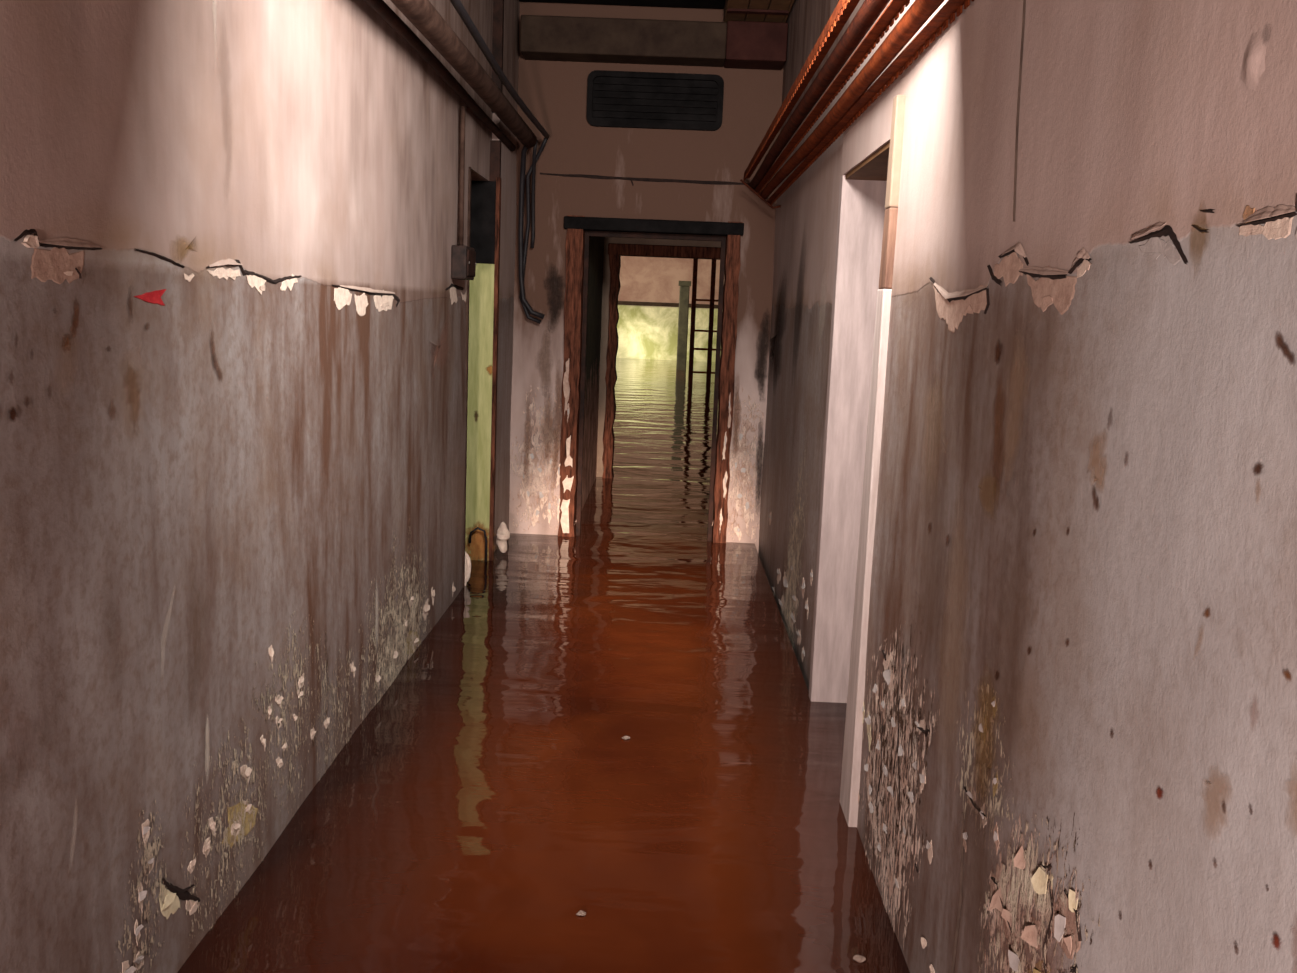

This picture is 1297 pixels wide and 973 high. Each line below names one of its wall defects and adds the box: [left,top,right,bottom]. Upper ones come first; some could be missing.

peeling [14,229,102,284]
peeling [184,259,302,294]
peeling [333,285,400,316]
peeling [929,242,1092,332]
peeling [1129,222,1188,265]
peeling [1191,209,1214,233]
peeling [1237,199,1297,240]
peeling [114,527,435,973]
peeling [858,606,940,950]
peeling [951,677,1100,973]